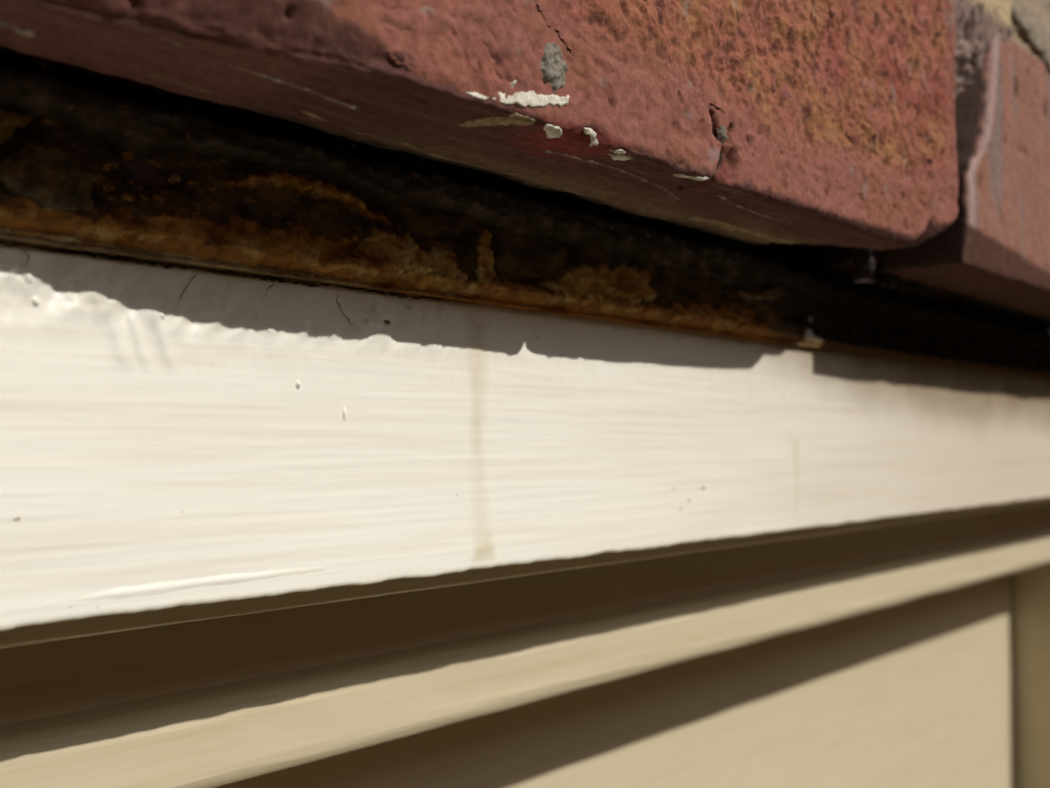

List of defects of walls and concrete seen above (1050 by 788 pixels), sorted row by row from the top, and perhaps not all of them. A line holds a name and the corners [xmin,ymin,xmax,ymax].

spalling [537,0,955,185]
rust [0,109,784,331]
water stain [688,217,807,244]